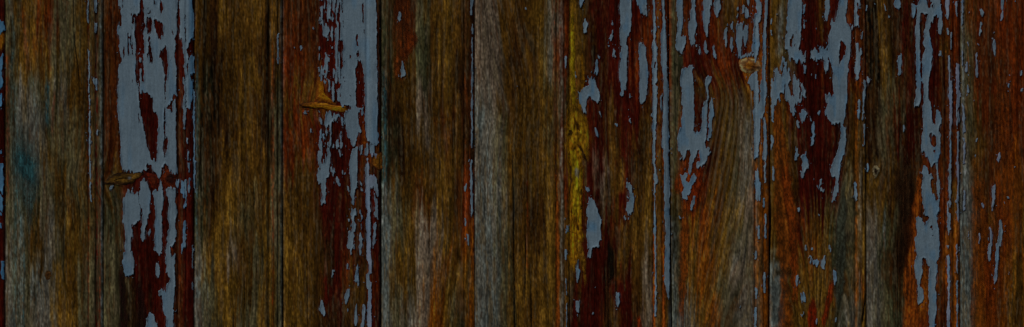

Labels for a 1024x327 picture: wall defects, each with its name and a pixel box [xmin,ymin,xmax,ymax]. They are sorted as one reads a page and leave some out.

peeling [117,0,197,327]
peeling [304,0,379,327]
peeling [564,0,1016,327]